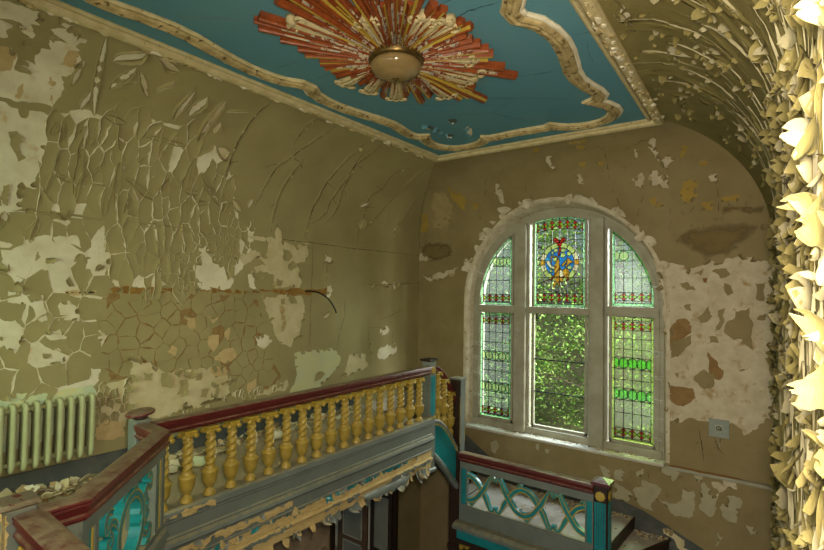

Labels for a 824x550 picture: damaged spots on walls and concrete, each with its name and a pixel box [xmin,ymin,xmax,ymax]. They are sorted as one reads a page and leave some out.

crack [225,100,274,178]
peeling [0,0,369,452]
crack [255,124,409,330]
peeling [423,184,534,282]
peeling [564,194,598,207]
peeling [576,0,824,550]
peeling [377,326,397,360]
peeling [164,499,216,524]
peeling [178,457,431,550]